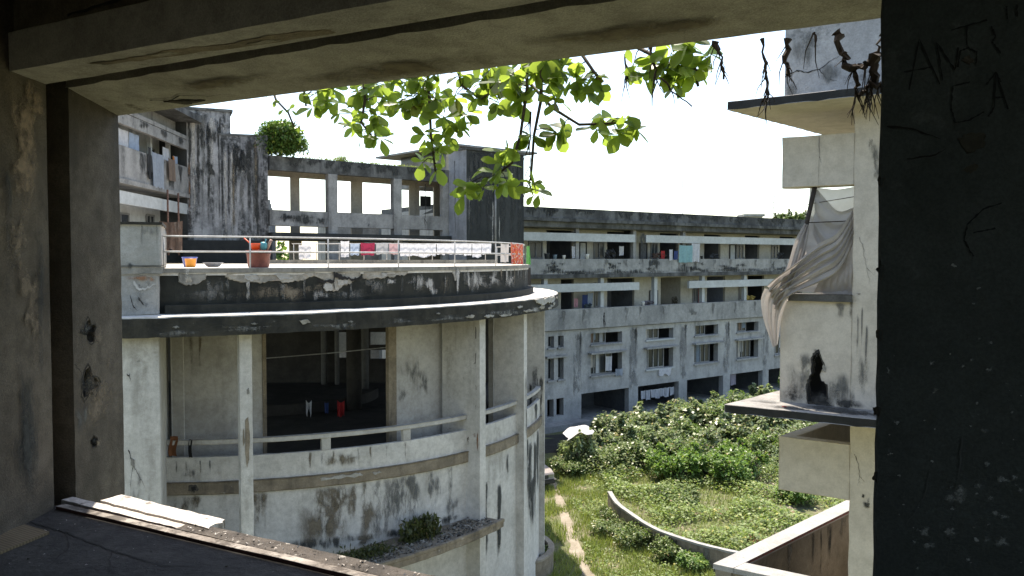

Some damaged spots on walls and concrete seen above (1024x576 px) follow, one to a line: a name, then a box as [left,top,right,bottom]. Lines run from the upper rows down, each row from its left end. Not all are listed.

leakage [161,117,259,240]
peeling [225,271,434,296]
spalling [80,317,101,345]
spalling [806,353,827,398]
leakage [526,369,543,522]
leakage [294,473,452,548]